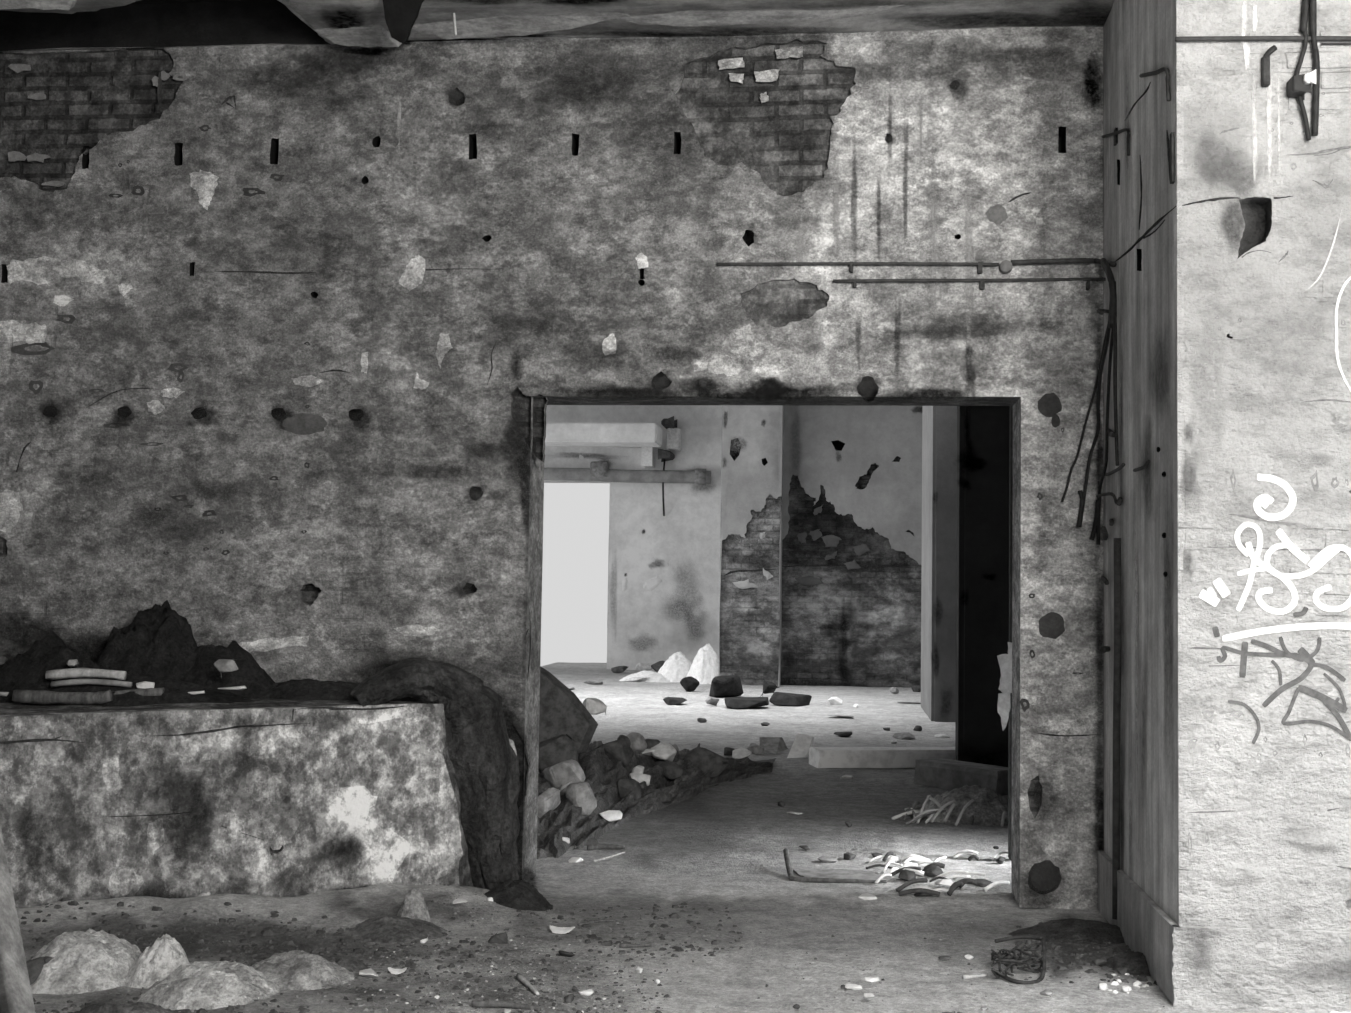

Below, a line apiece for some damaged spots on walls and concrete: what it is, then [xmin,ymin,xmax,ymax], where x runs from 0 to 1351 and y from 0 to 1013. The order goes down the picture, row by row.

spalling [0,48,187,192]
spalling [675,38,856,214]
peeling [109,185,145,198]
peeling [243,174,284,197]
peeling [0,294,76,355]
peeling [1310,470,1351,493]
spalling [720,475,922,687]